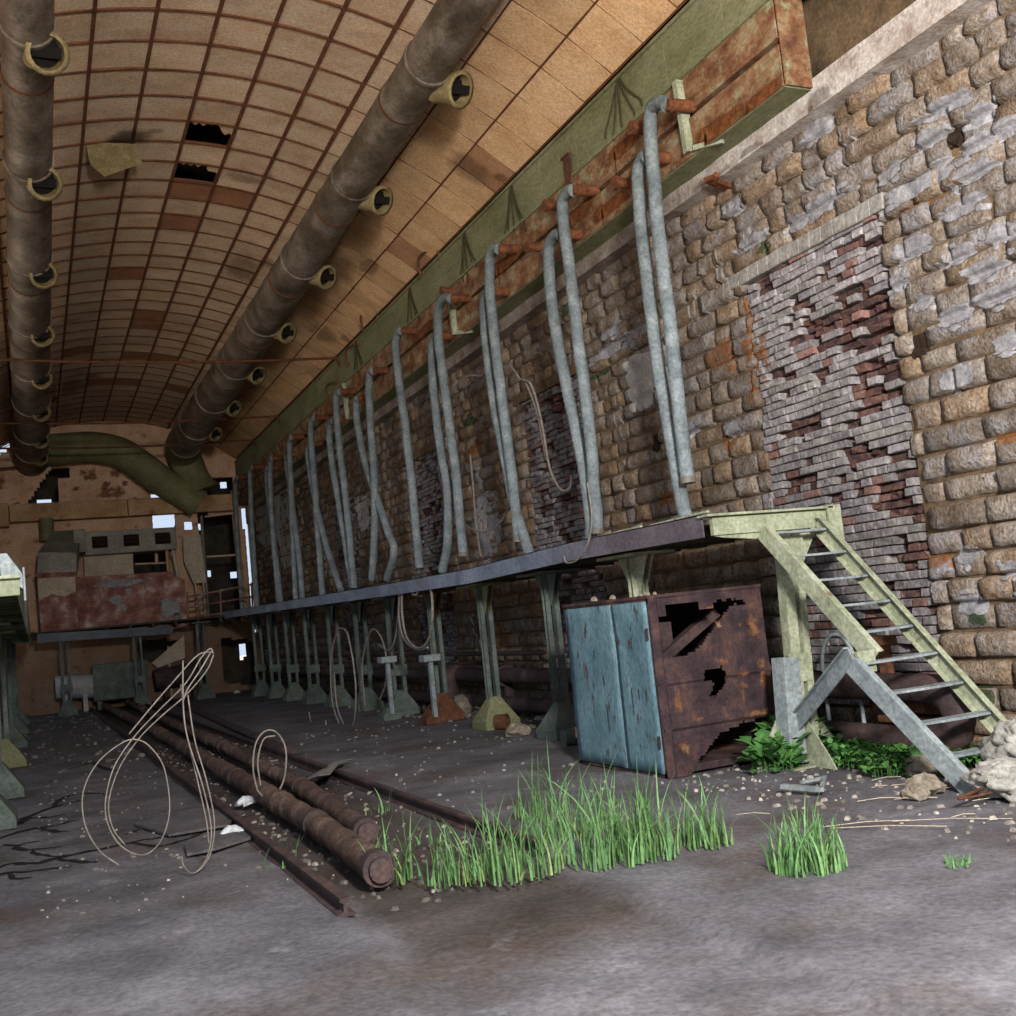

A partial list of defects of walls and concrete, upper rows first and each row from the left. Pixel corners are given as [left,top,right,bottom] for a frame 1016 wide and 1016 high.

rust [693,78,780,146]
rust [608,134,641,174]
flaking render [877,86,1016,222]
rust [569,191,629,229]
rust [495,249,522,284]
spalling [788,220,1016,429]
spalling [778,414,826,442]
spalling [523,385,582,543]
spalling [785,459,823,496]
spalling [831,444,926,523]
spalling [857,609,888,630]
crack [0,757,207,879]